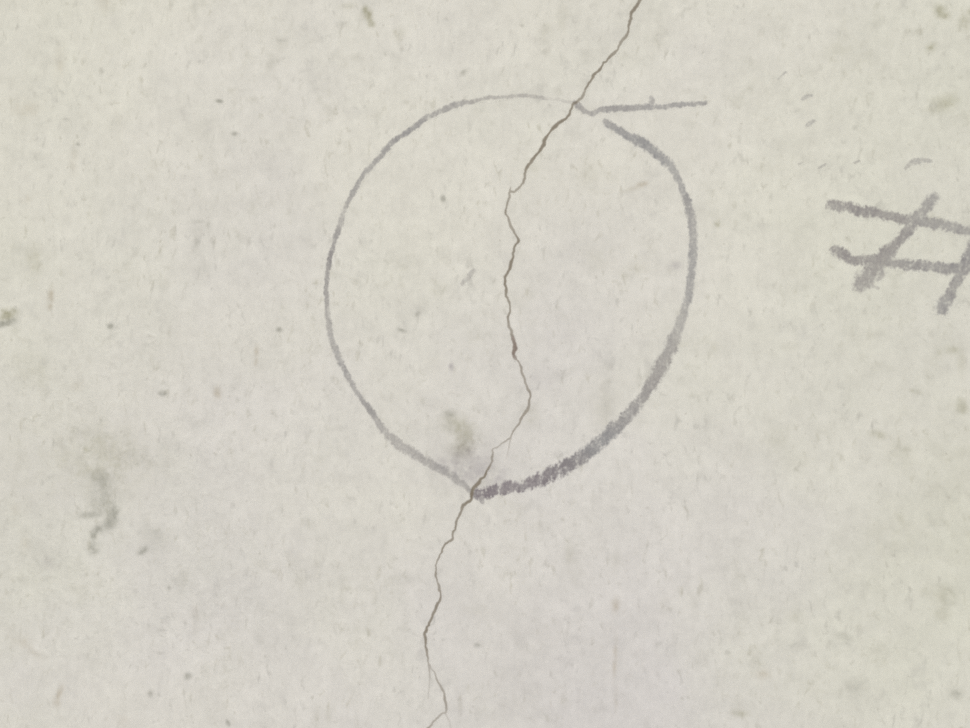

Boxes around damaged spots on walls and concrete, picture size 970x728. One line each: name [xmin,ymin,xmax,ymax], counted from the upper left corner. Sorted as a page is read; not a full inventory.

crack [421,0,644,728]